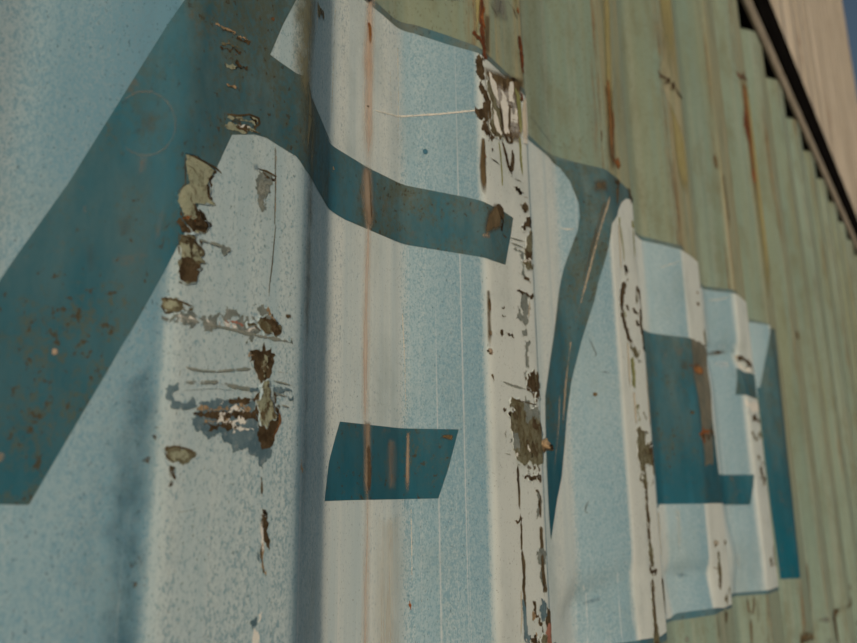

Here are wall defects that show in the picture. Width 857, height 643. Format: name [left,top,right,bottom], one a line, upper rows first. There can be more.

corrosion [472,0,489,59]
corrosion [601,0,621,169]
peeling [174,152,231,285]
corrosion [364,169,372,267]
peeling [474,53,544,484]
peeling [161,297,294,470]
peeling [619,264,655,479]